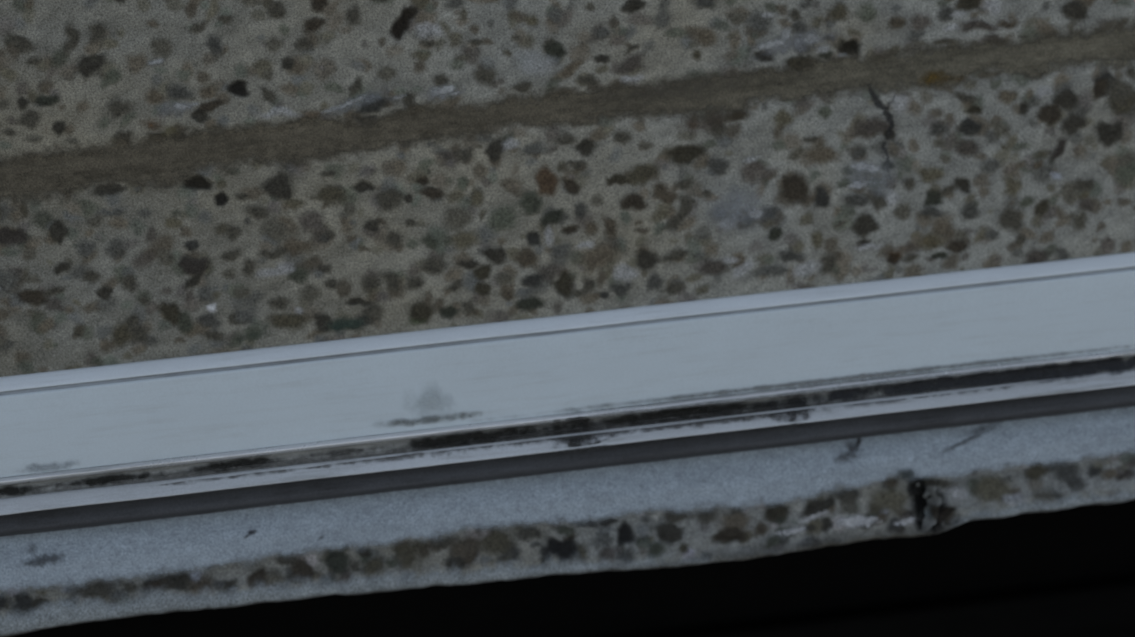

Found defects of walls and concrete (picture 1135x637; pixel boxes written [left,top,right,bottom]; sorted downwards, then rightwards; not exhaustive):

crack [868,84,894,178]
spalling [776,512,878,536]
spalling [895,480,966,533]